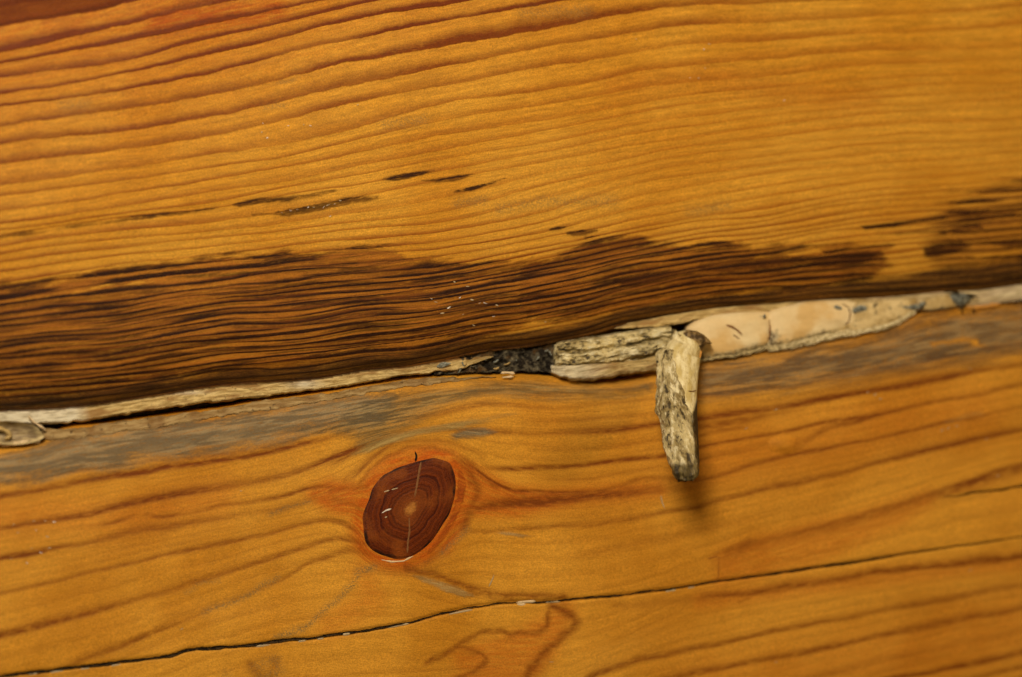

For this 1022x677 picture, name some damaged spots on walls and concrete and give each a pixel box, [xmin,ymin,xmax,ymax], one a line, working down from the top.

crack [946,485,1022,497]
crack [0,536,1022,677]